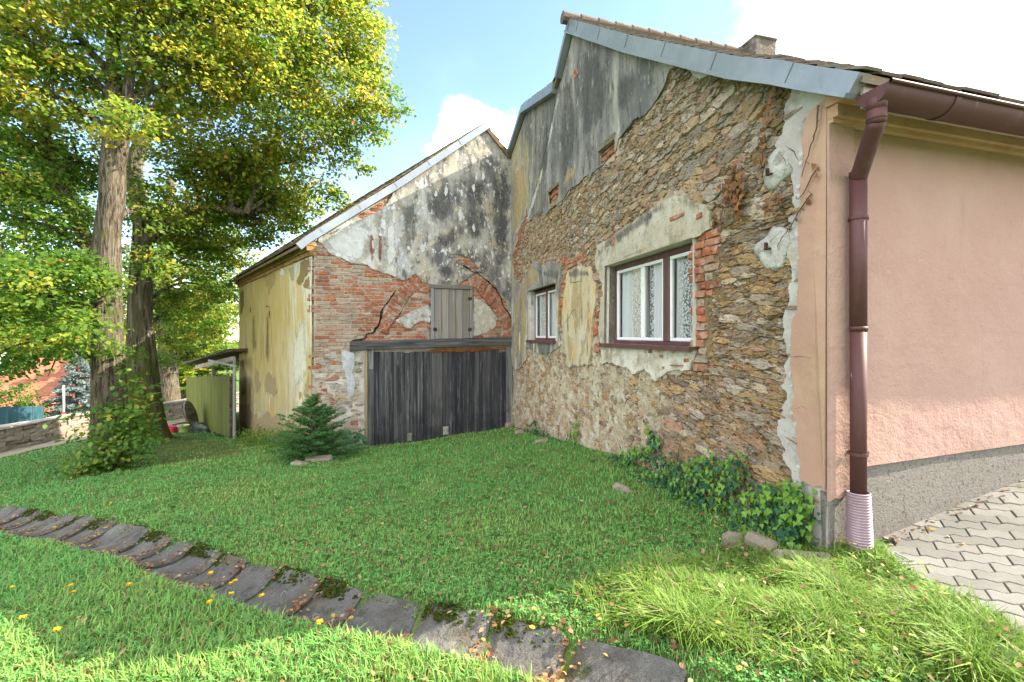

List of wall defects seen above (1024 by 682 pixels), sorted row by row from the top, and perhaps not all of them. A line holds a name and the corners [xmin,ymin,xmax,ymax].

leakage [403,204,416,247]
leakage [433,189,455,245]
peeling [418,172,485,197]
leakage [467,57,635,244]
spalling [240,192,446,449]
crack [352,291,414,341]
spalling [449,247,511,338]
spalling [512,67,846,553]